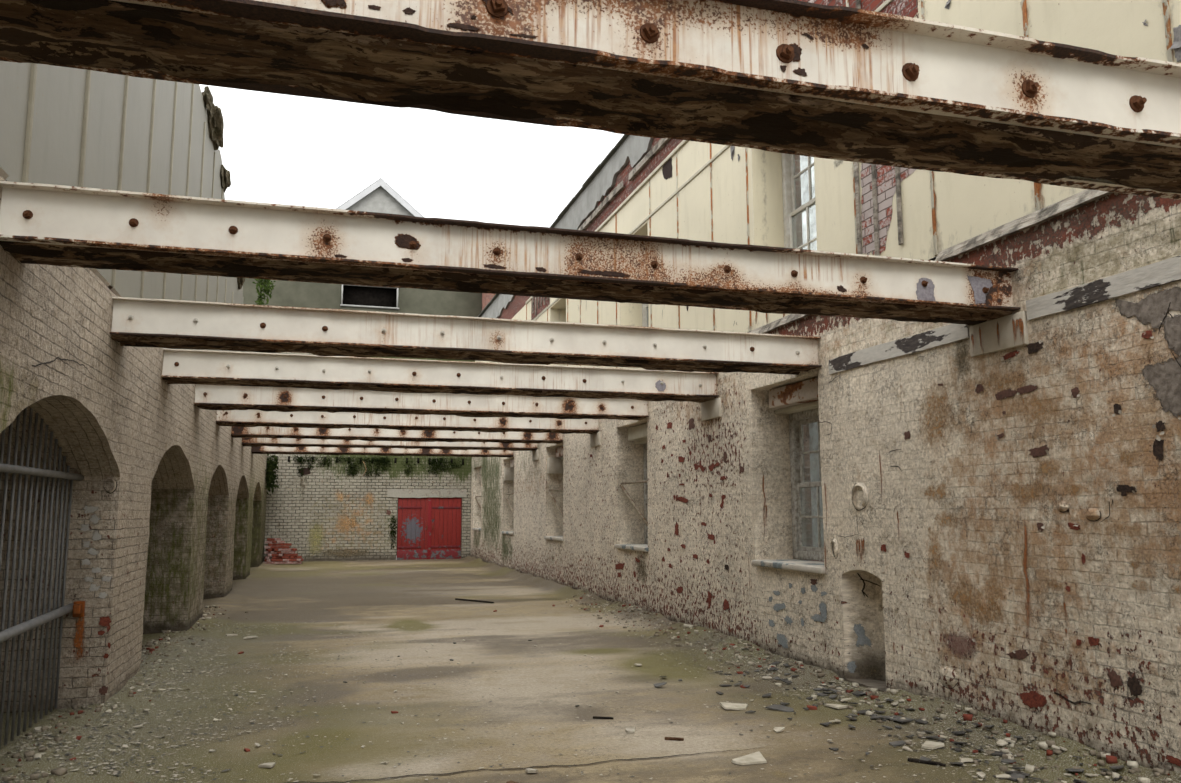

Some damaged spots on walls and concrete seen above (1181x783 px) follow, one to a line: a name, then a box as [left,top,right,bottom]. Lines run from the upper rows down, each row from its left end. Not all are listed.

rust [780,33,814,76]
flaking render [861,163,916,255]
rust [394,234,421,262]
rust [578,268,630,278]
spalling [1112,285,1181,462]
spalling [661,418,727,509]
spalling [662,520,710,568]
spalling [706,588,729,611]
peeling [768,577,827,648]
rust [73,615,85,659]